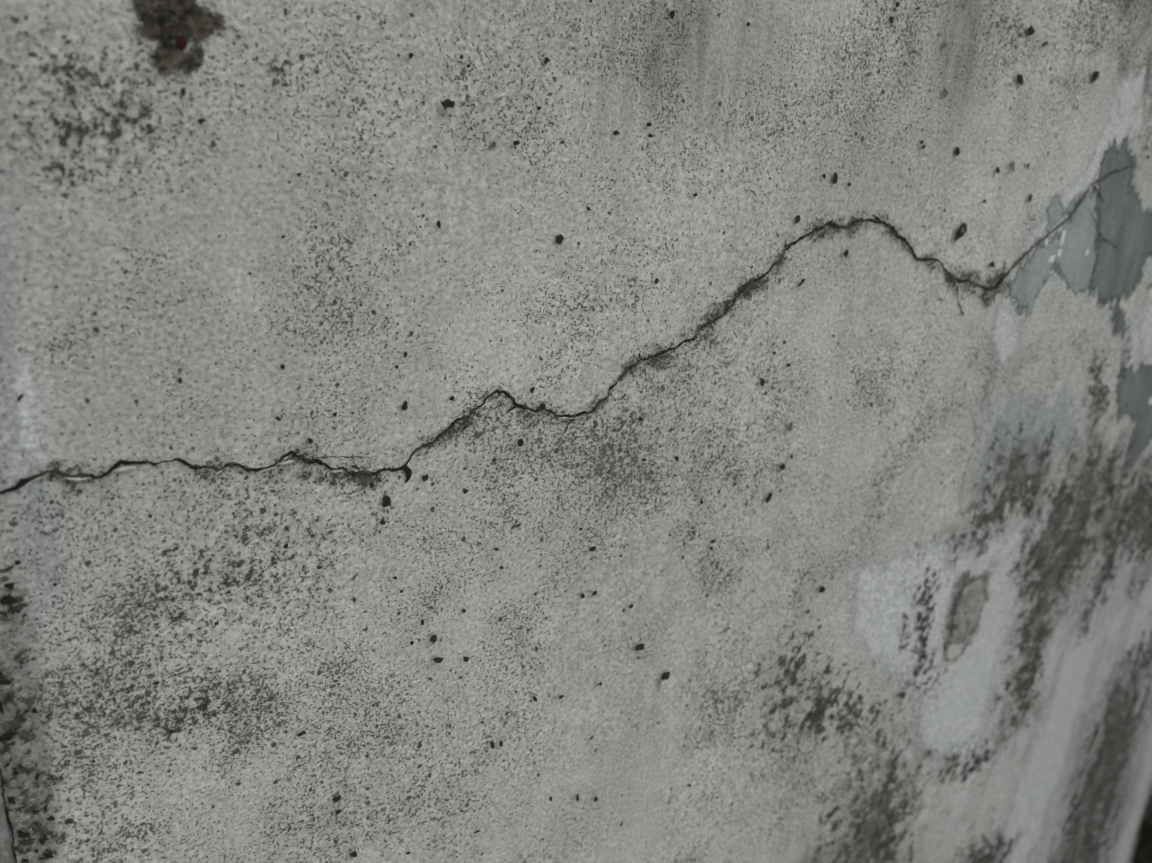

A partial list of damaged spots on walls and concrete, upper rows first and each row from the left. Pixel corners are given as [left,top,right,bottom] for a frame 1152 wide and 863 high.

crack [0,165,1134,501]
water stain [991,297,1019,366]
peeling [1003,136,1152,470]
water stain [1020,53,1152,257]
water stain [737,356,1152,863]
crack [0,769,17,863]